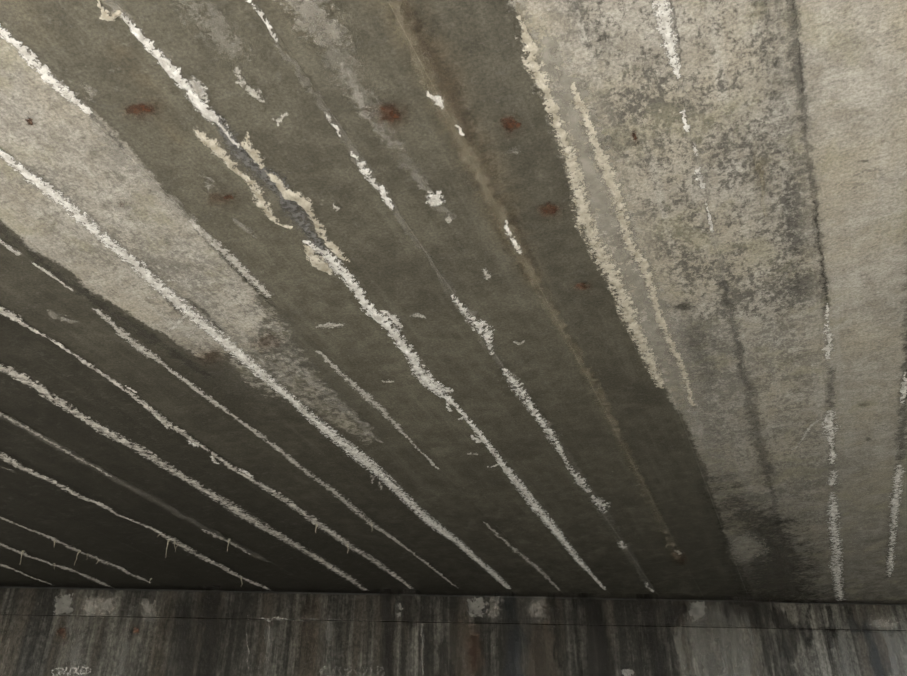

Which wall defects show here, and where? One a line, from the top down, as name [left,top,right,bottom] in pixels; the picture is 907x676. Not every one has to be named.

efflorescence [0,25,93,114]
leakage [508,0,701,415]
leakage [822,303,834,359]
leakage [0,149,523,676]
leakage [483,522,560,668]
leakage [576,593,616,676]
leakage [637,410,901,676]
efflorescence [886,465,906,577]